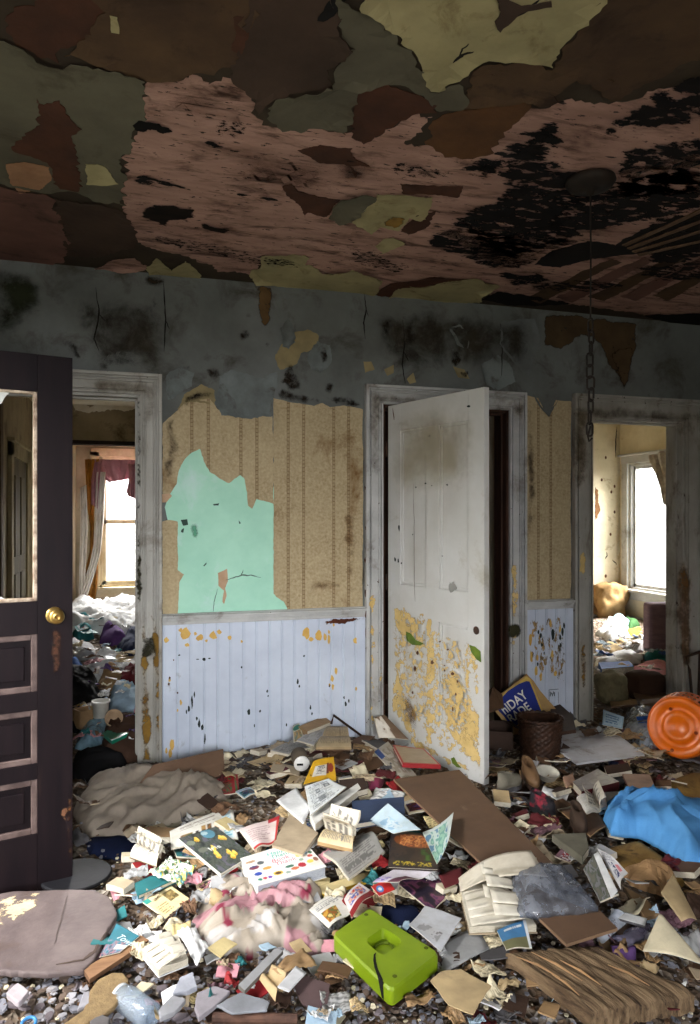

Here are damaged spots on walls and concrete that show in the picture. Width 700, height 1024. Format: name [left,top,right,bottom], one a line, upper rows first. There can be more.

flaking render [6,0,700,315]
leakage [427,122,700,386]
leakage [0,276,38,328]
leakage [87,308,156,367]
crack [162,283,170,348]
leakage [382,316,523,377]
leakage [281,366,308,402]
flaking render [162,449,287,613]
peeling [164,627,243,661]
peeling [302,623,335,644]
peeling [353,590,481,771]
peeling [529,618,565,681]